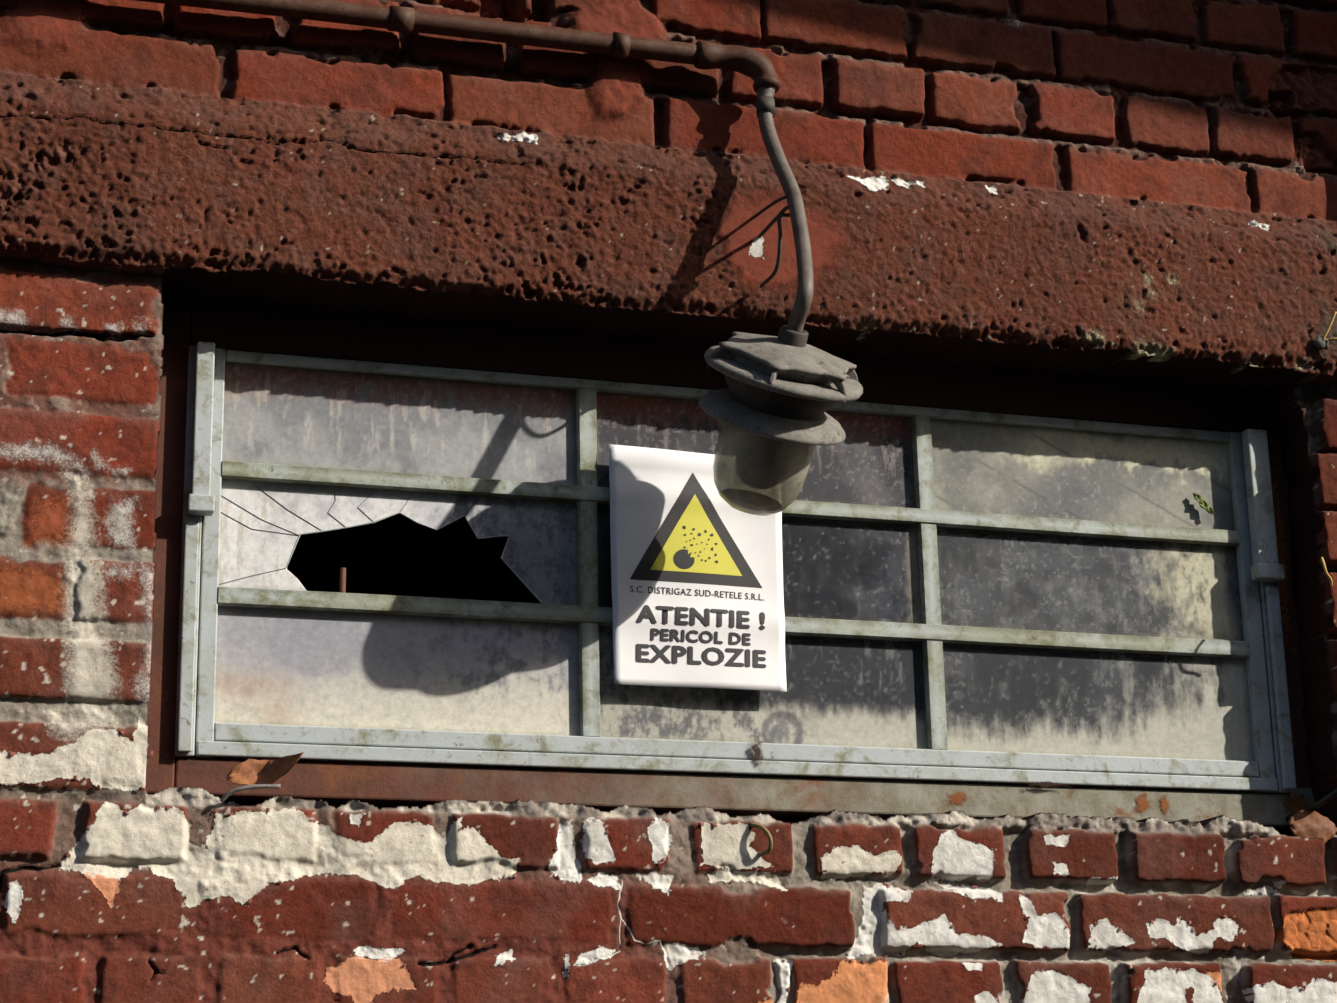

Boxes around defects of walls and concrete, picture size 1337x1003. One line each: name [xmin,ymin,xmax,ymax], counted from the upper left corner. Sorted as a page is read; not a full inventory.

water stain [0,444,134,740]
peeling [0,714,521,909]
crack [0,866,58,889]
peeling [548,817,621,890]
peeling [699,821,788,891]
peeling [927,830,1003,902]
crack [276,948,308,959]
crack [418,947,494,966]
peeling [757,844,1002,1003]
peeling [1019,895,1070,951]
peeling [1022,970,1091,1003]
peeling [1086,915,1239,1003]